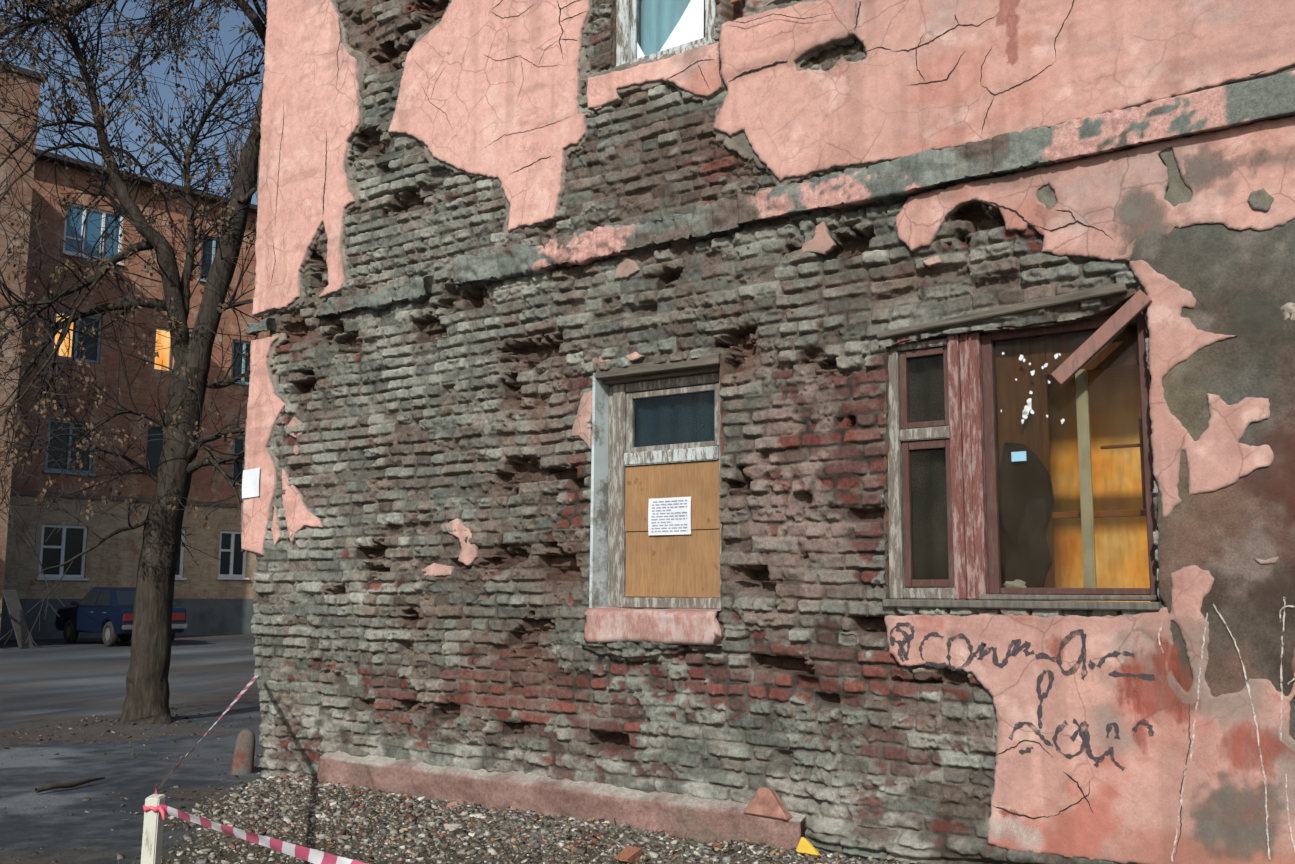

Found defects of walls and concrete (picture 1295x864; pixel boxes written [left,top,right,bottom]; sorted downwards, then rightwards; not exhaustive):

crack [487,0,585,101]
crack [667,0,1074,134]
crack [491,116,571,174]
damp [1117,193,1168,260]
peeling [1159,136,1192,206]
peeling [1248,188,1274,212]
spalling [250,0,1149,864]
peeling [1130,218,1295,697]
crack [990,740,1094,819]